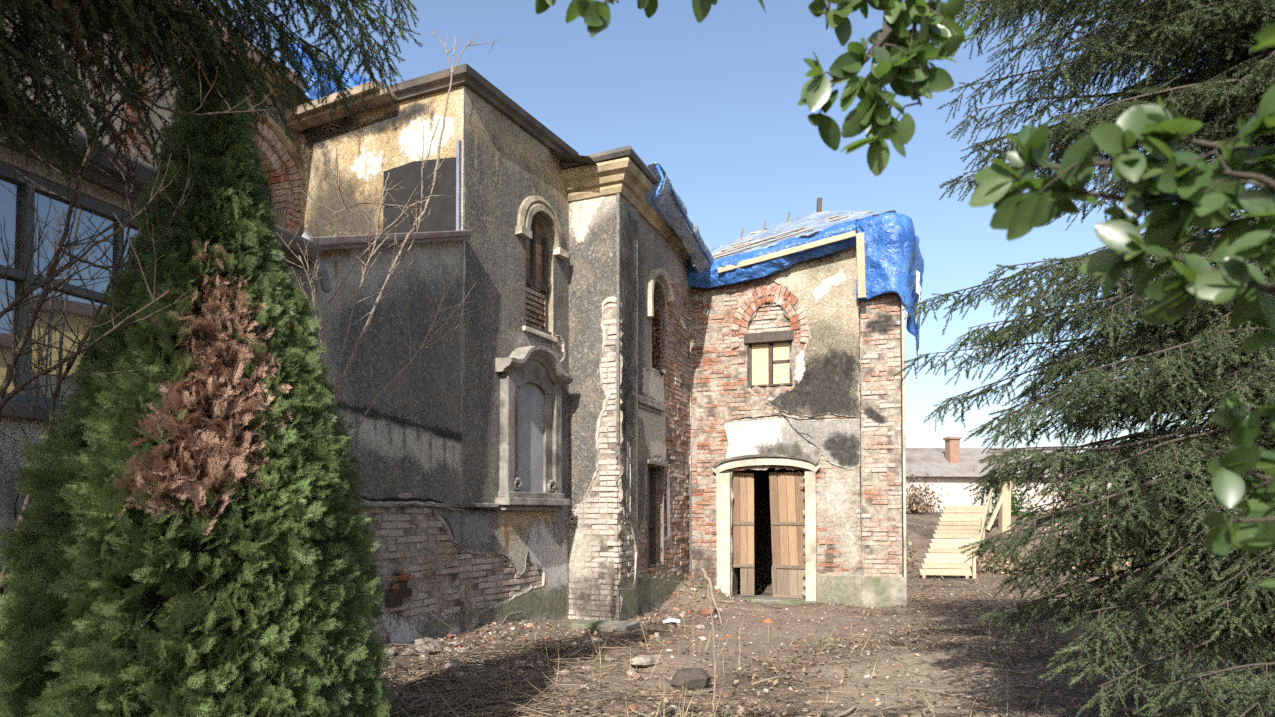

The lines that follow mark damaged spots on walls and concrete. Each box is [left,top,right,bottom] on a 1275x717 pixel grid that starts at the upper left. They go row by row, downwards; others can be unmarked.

peeling [349,140,387,185]
water stain [303,103,433,237]
peeling [398,113,457,165]
water stain [770,349,885,423]
spalling [358,261,903,648]
water stain [824,433,860,466]